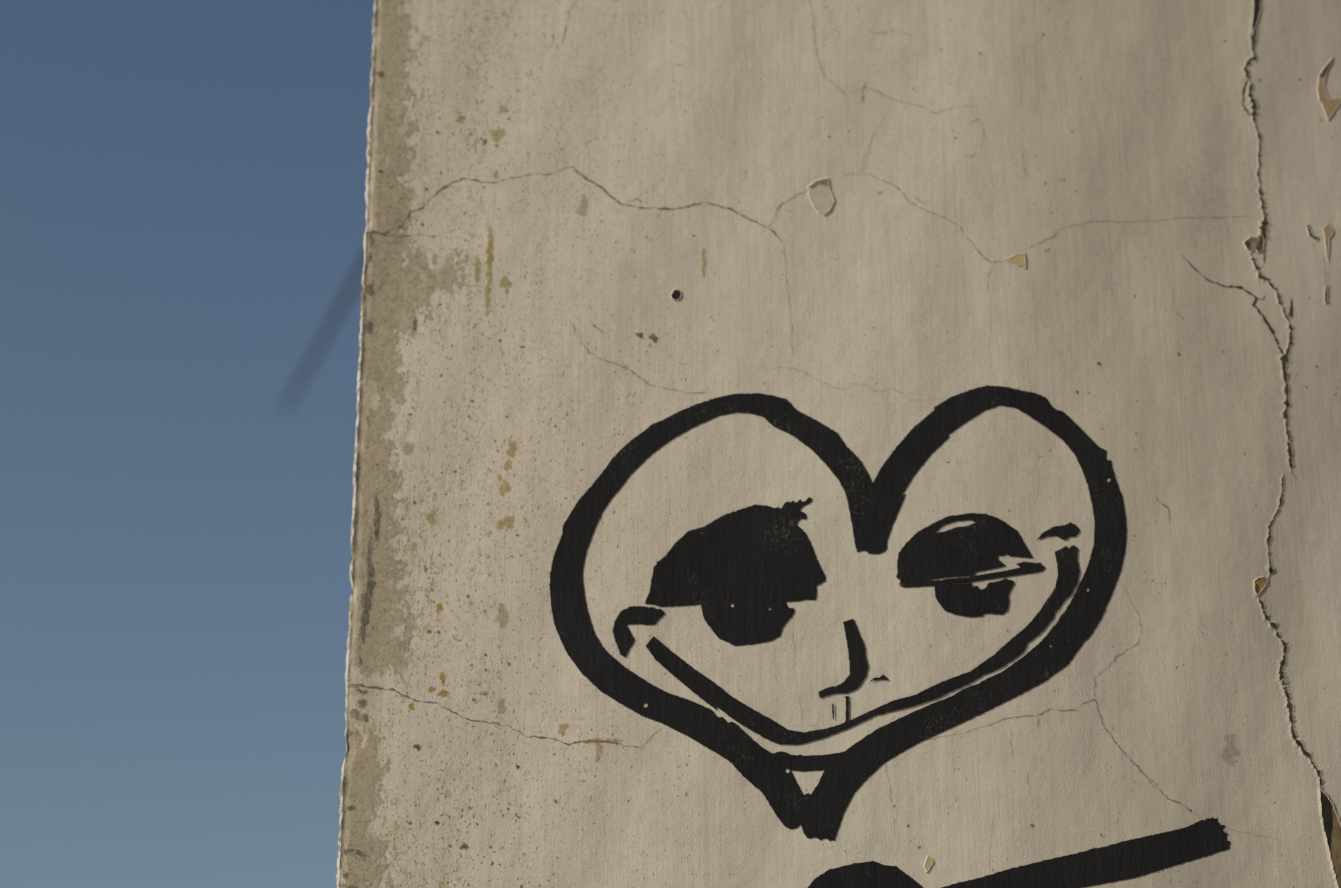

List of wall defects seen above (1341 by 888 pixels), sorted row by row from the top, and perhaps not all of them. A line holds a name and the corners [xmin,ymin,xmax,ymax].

crack [369,167,807,341]
crack [1181,0,1341,888]
crack [356,684,660,747]